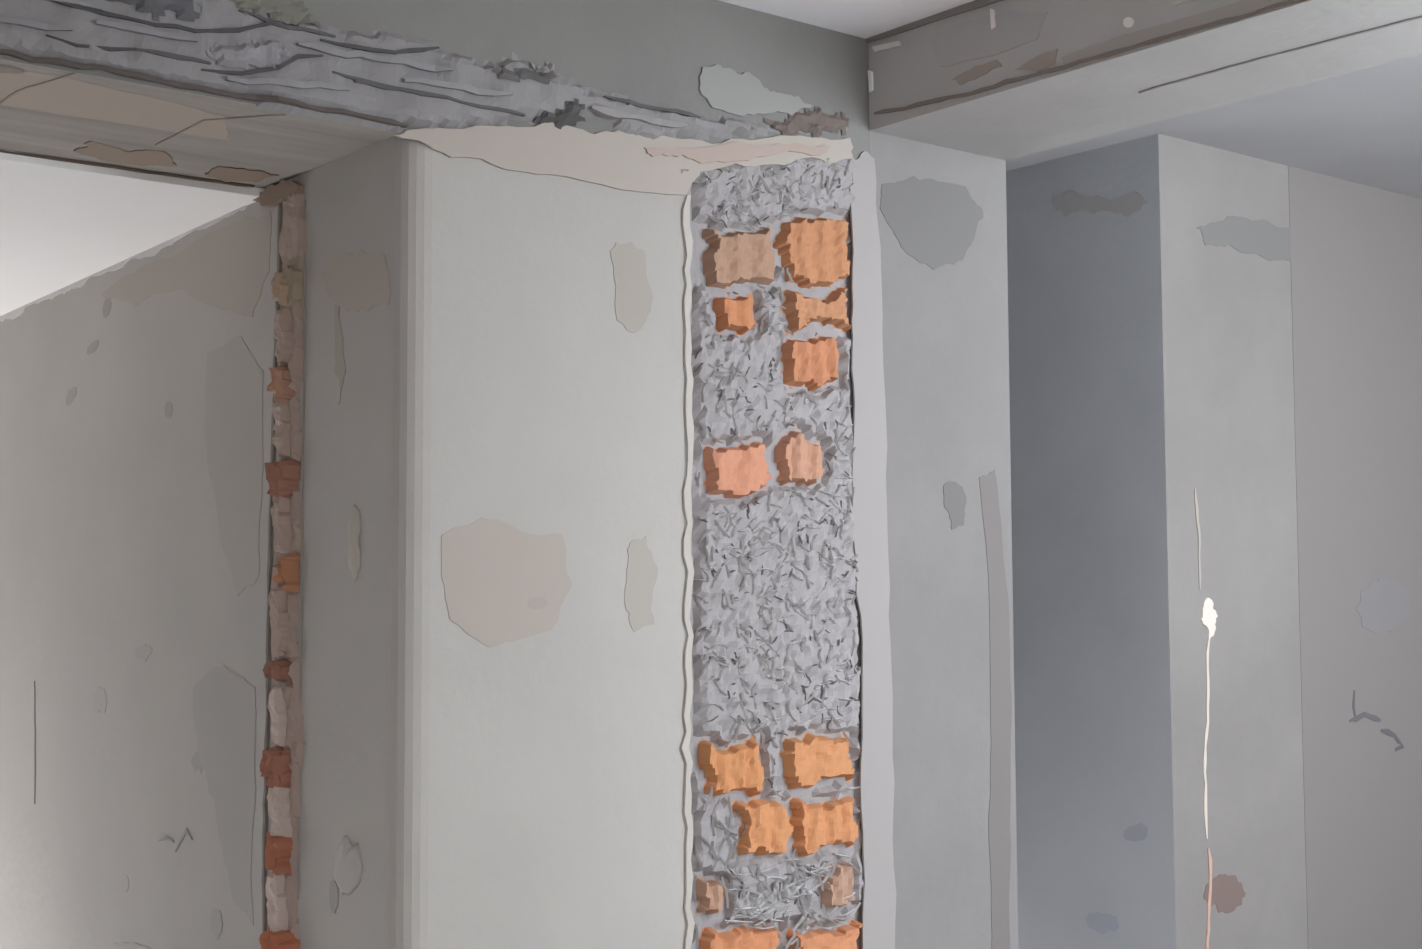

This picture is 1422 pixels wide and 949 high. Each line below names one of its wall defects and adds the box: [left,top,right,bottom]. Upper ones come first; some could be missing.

crack [0,0,525,128]
spalling [0,0,782,140]
spalling [253,180,304,207]
flaking render [267,364,296,403]
flaking render [264,459,300,499]
flaking render [272,554,300,593]
spalling [680,158,864,949]
flaking render [263,659,292,681]
flaking render [260,746,292,788]
flaking render [263,832,293,874]
flaking render [259,928,300,949]